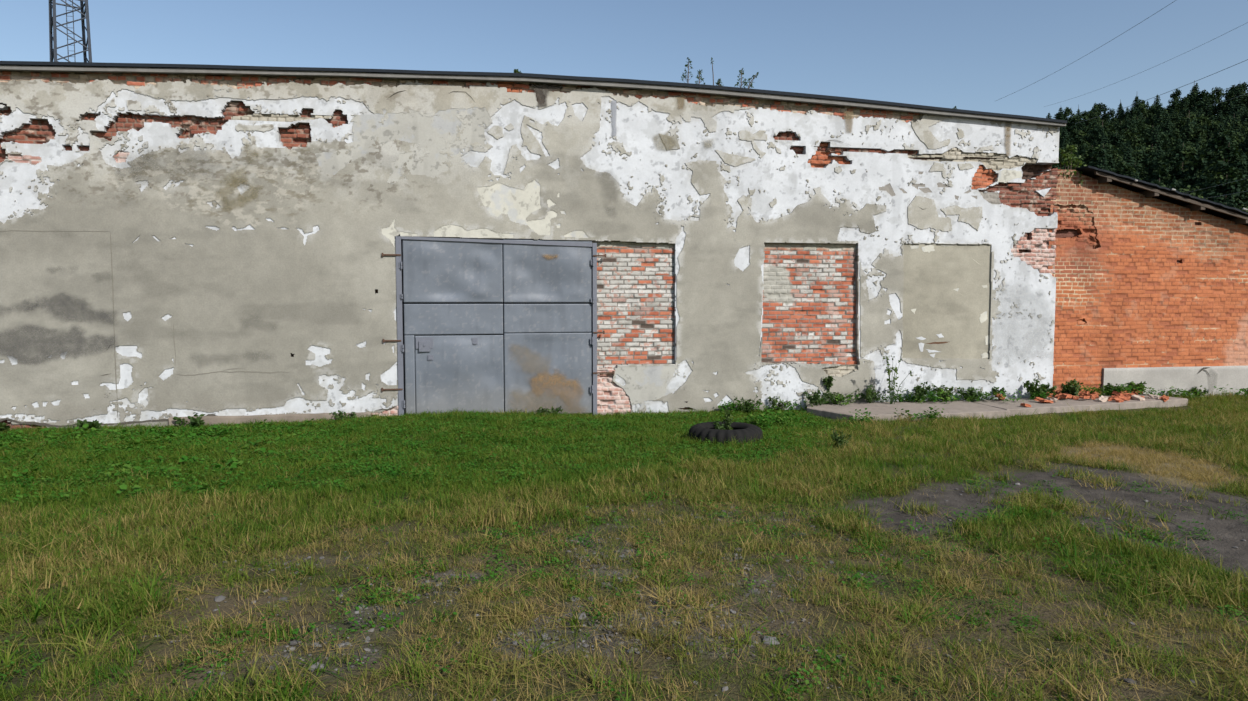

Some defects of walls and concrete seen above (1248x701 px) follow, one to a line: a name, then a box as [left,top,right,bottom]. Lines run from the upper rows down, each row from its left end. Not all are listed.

peeling [0,71,1169,415]
leakage [0,298,113,362]
peeling [0,341,399,430]